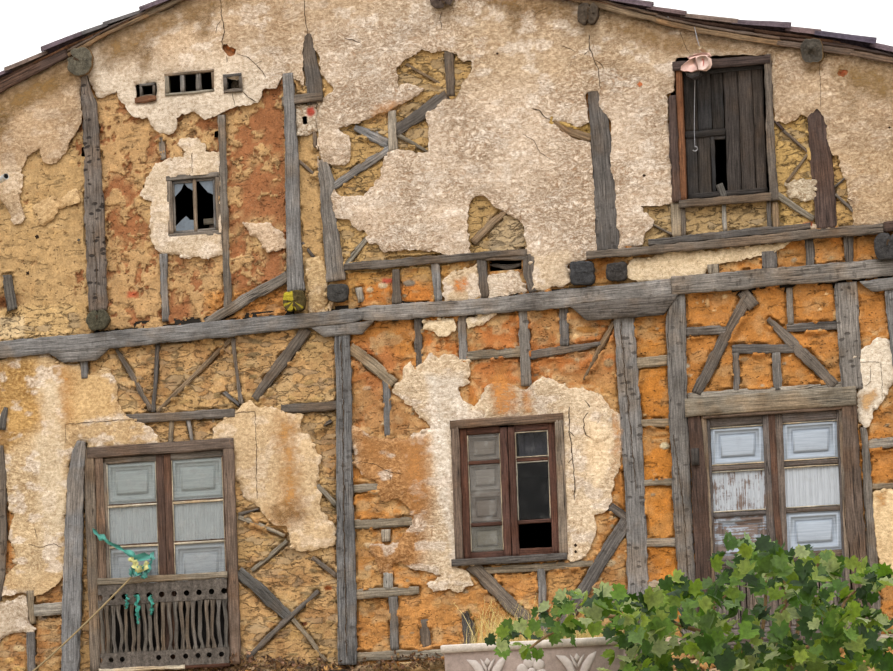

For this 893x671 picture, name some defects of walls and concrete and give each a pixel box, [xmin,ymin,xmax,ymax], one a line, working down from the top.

crack [215,0,266,78]
flaking render [331,49,472,197]
flaking render [549,116,589,140]
flaking render [0,53,336,341]
flaking render [336,196,571,301]
peeling [422,313,497,337]
peeling [853,337,893,428]
peeling [0,353,160,642]
peeling [212,400,337,552]
peeling [351,353,622,593]
peeling [872,488,893,569]